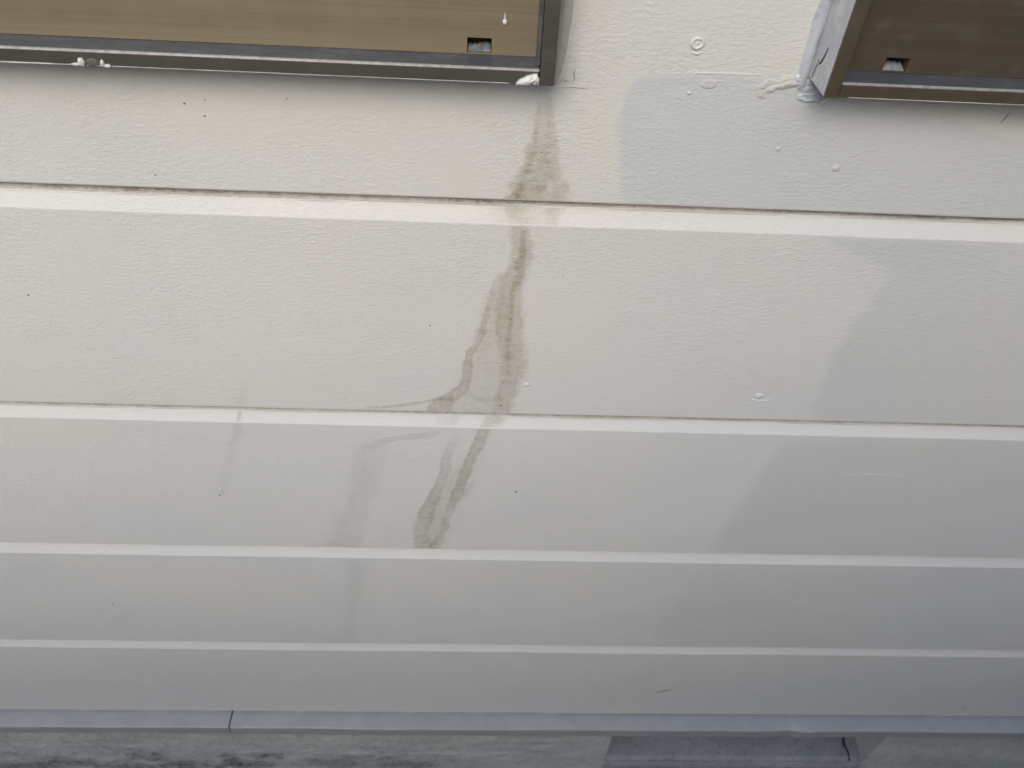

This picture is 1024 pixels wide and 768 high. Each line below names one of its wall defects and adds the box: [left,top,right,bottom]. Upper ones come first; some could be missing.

water stain [306,84,573,643]